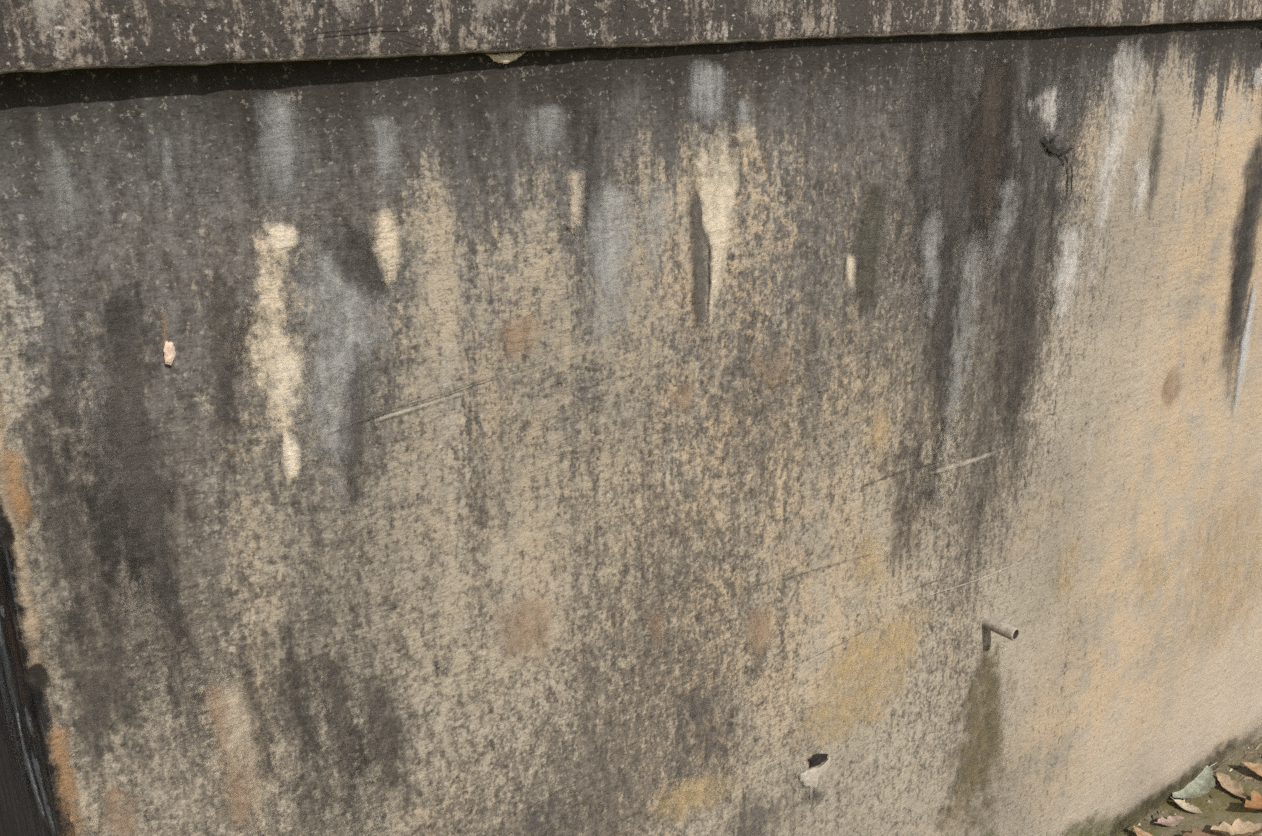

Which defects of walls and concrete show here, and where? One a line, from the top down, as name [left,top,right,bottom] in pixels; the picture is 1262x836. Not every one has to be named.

water stain [265,98,294,183]
water stain [571,110,630,333]
water stain [691,192,707,326]
water stain [731,137,744,191]
water stain [847,185,887,308]
water stain [882,59,1062,559]
water stain [1058,231,1077,312]
water stain [1100,55,1143,225]
water stain [1137,114,1164,204]
water stain [1226,139,1262,410]
spalling [800,750,831,799]